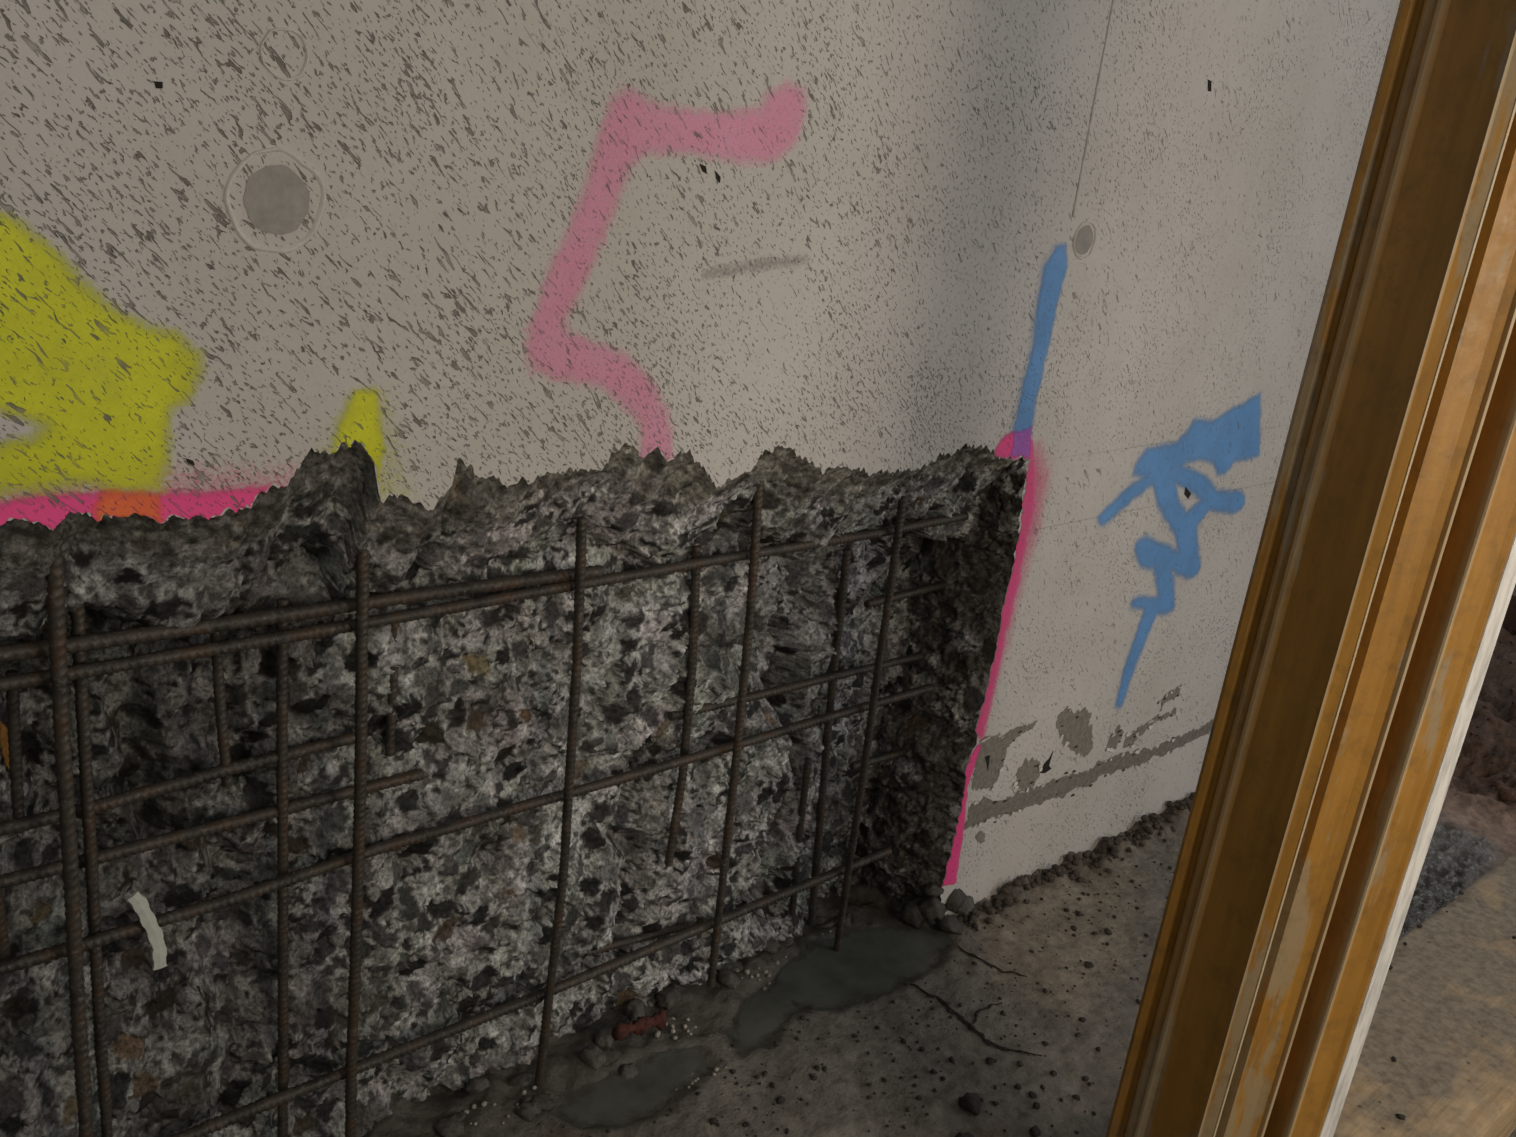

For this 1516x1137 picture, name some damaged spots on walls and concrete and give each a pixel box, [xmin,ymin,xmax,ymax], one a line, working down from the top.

spalling [0,440,1214,1137]
crack [971,1002,1003,1024]